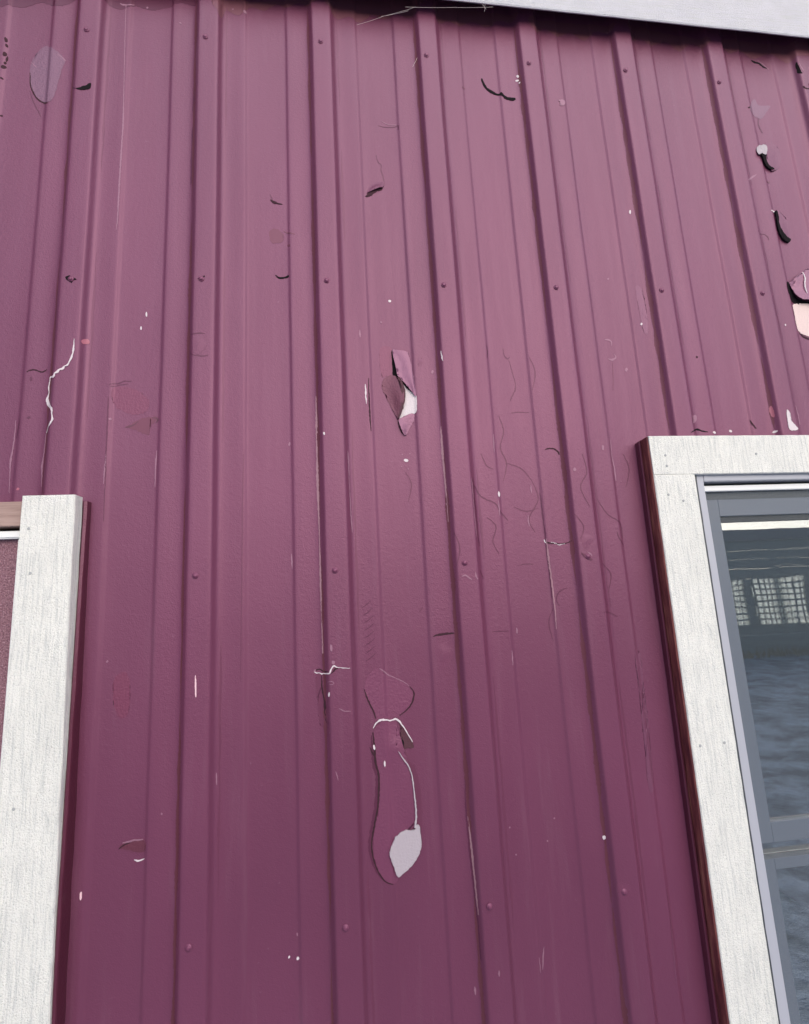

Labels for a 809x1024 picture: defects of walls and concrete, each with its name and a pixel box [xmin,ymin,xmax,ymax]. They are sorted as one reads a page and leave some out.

peeling [30,46,65,102]
peeling [785,303,809,336]
crack [27,339,75,487]
peeling [399,386,417,419]
peeling [769,406,798,433]
crack [315,665,349,723]
peeling [389,824,422,877]